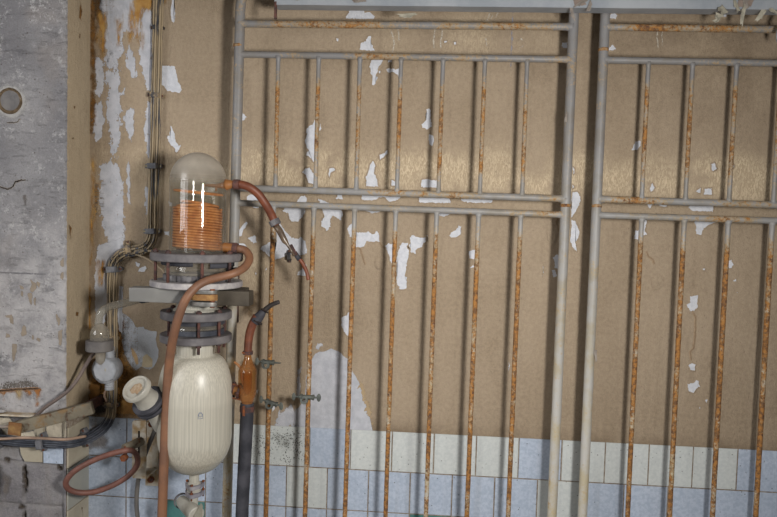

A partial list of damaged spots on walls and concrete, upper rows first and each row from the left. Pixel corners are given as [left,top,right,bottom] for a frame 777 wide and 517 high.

peeling [344,0,376,21]
peeling [162,64,183,94]
peeling [358,35,399,87]
crack [0,179,26,190]
crack [0,269,46,277]
peeling [93,0,152,328]
peeling [301,119,323,185]
peeling [239,194,430,291]
peeling [360,149,402,215]
peeling [569,166,582,253]
crack [0,385,39,393]
peeling [271,343,373,430]